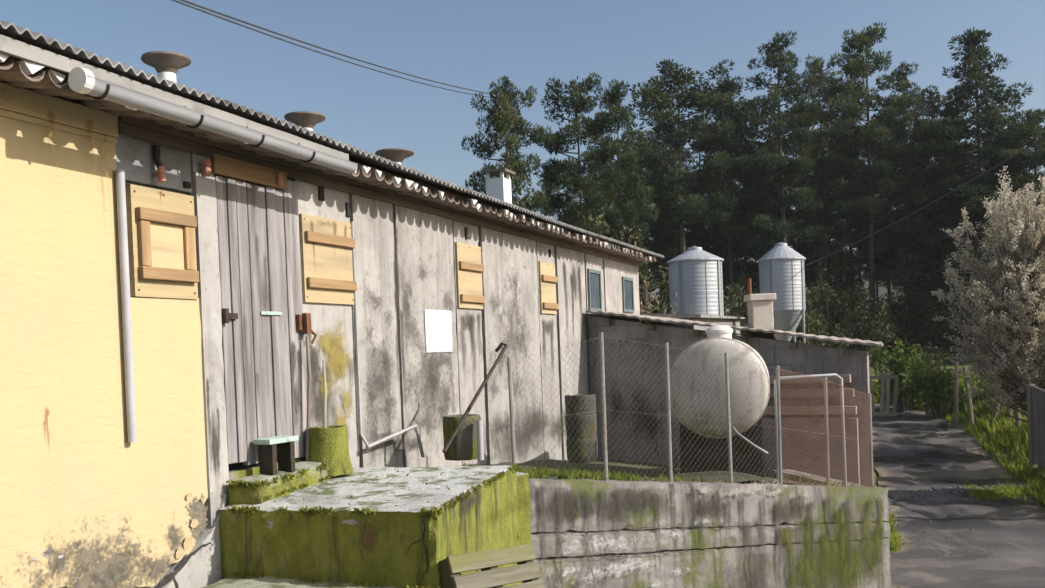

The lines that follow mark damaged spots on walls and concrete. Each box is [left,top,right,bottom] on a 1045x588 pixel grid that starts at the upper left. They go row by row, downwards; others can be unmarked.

damp [369,227,453,452]
damp [462,314,482,368]
damp [544,320,554,368]
damp [493,414,566,461]
damp [29,519,185,588]
crack [155,542,211,588]
damp [538,486,679,588]